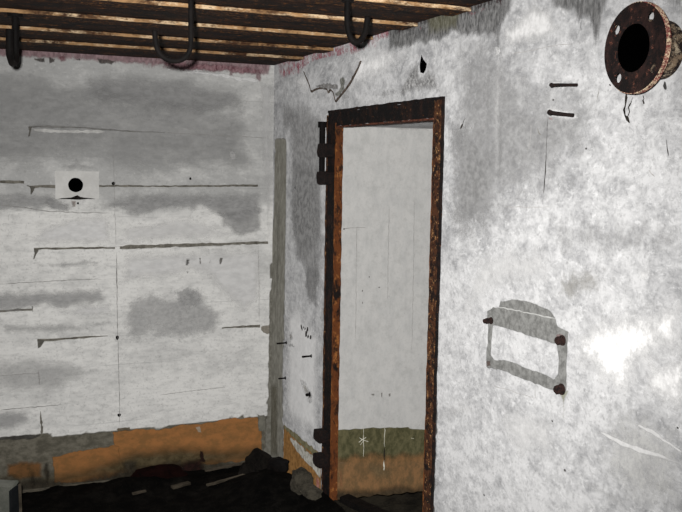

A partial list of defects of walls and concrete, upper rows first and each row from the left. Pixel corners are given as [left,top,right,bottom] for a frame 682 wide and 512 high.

leakage [0,195,67,210]
leakage [115,196,259,234]
leakage [284,109,320,301]
peeling [0,138,323,501]